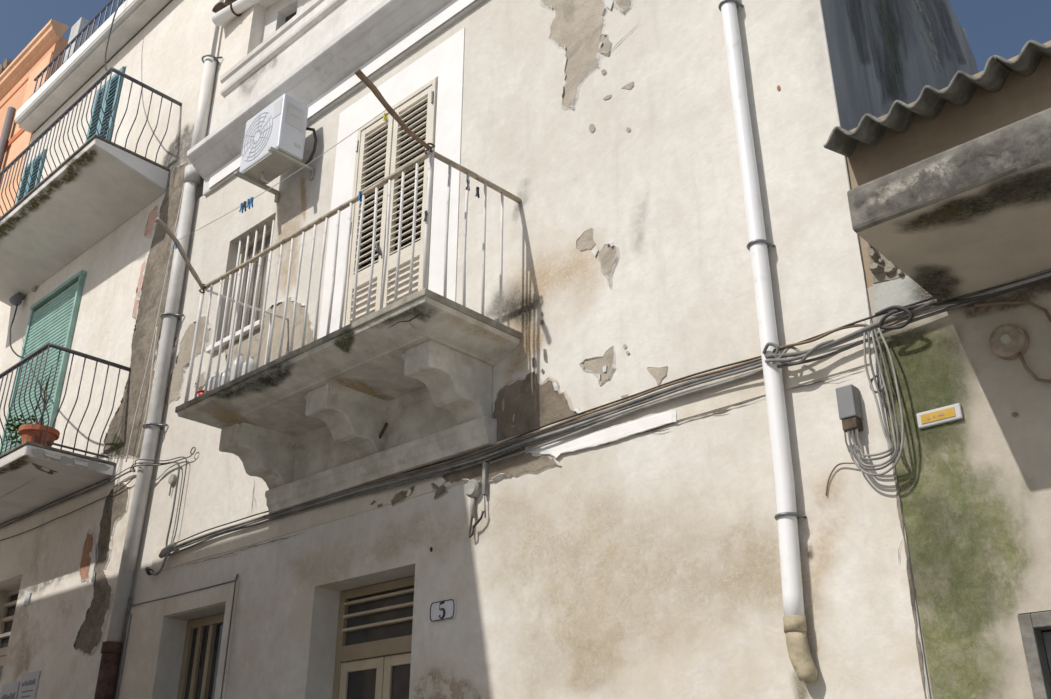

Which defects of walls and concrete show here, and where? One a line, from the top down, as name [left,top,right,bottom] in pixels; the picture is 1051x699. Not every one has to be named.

flaking render [540,0,637,111]
water stain [850,0,966,98]
water stain [855,132,1051,228]
flaking render [576,228,620,289]
flaking render [32,161,189,475]
flaking render [164,315,212,405]
flaking render [431,349,593,500]
water stain [496,297,534,320]
flaking render [579,344,629,387]
flaking render [647,366,668,385]
water stain [884,336,964,442]
flaking render [72,480,130,656]